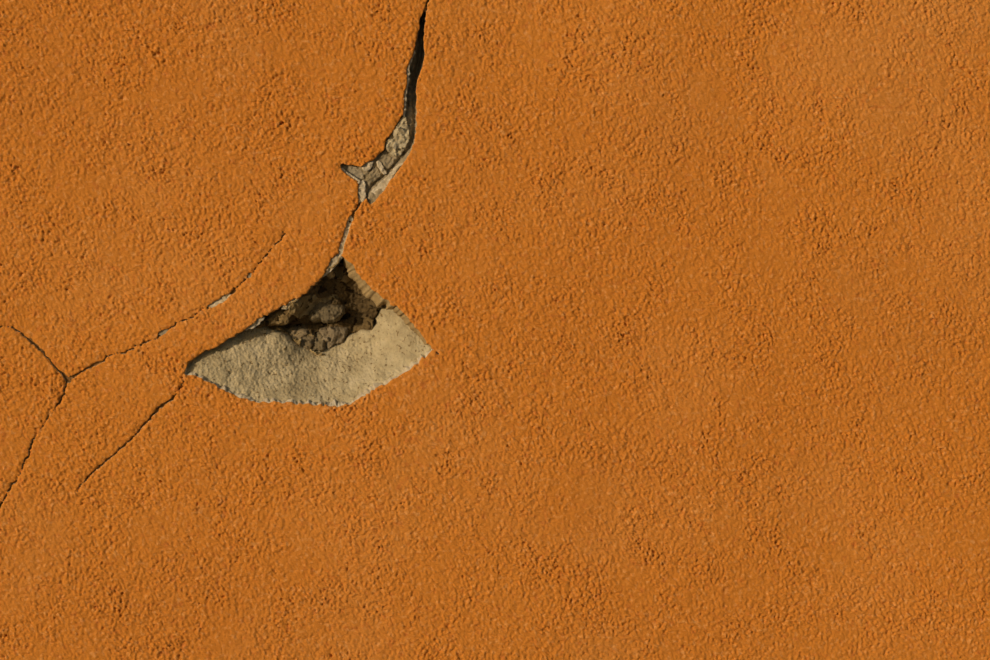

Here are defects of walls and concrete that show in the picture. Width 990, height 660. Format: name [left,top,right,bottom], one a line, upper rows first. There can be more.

crack [337,0,429,256]
crack [0,233,286,508]
spalling [185,254,433,407]